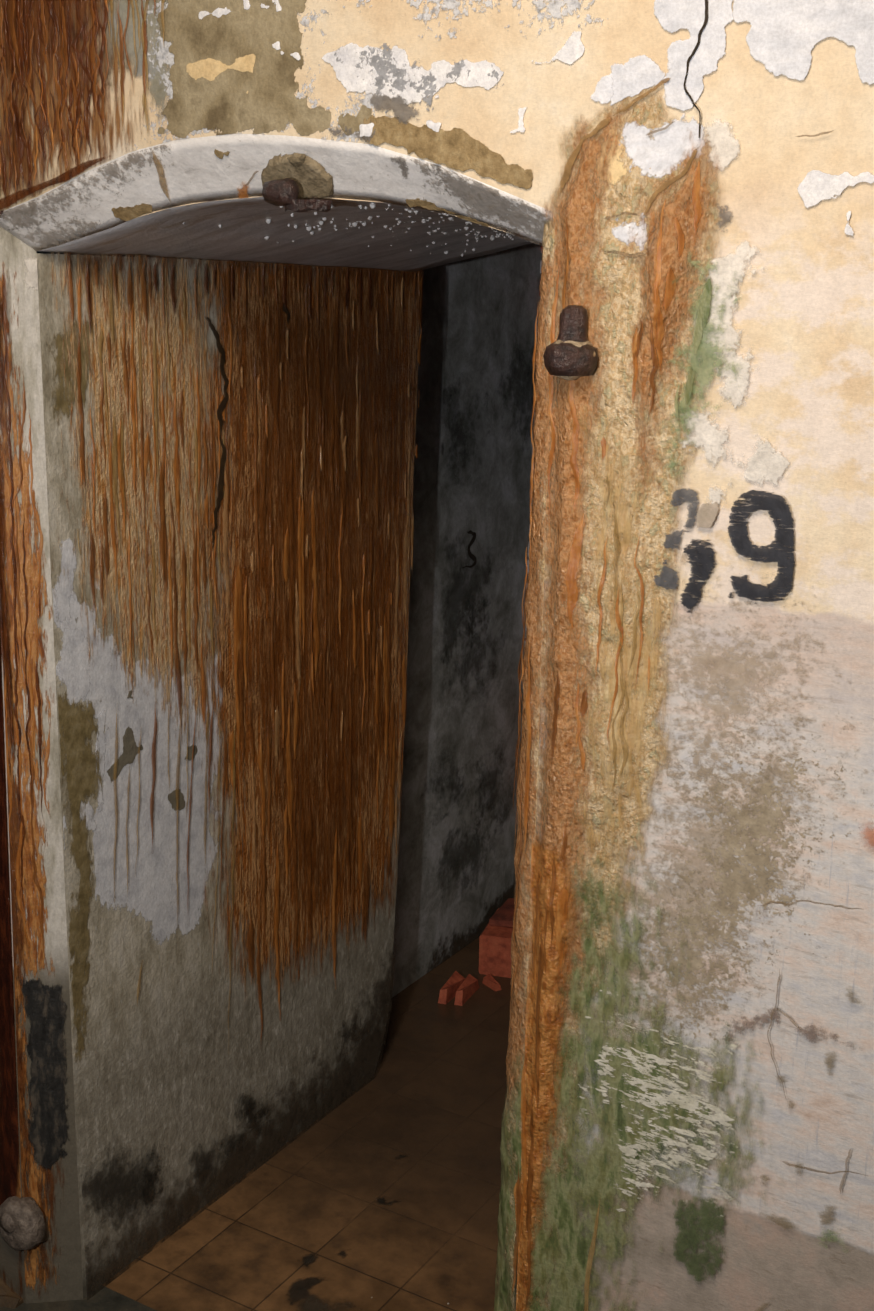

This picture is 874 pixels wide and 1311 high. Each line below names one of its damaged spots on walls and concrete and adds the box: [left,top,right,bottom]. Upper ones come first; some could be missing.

corrosion [0,0,164,215]
peeling [98,0,533,189]
crack [560,0,708,219]
peeling [591,0,874,111]
crack [797,130,832,138]
damp [502,349,535,436]
peeling [52,538,224,945]
corrosion [0,252,423,1298]
corrosion [506,116,715,1311]
damp [22,693,102,1170]
crack [762,900,860,909]
damp [82,953,395,1300]